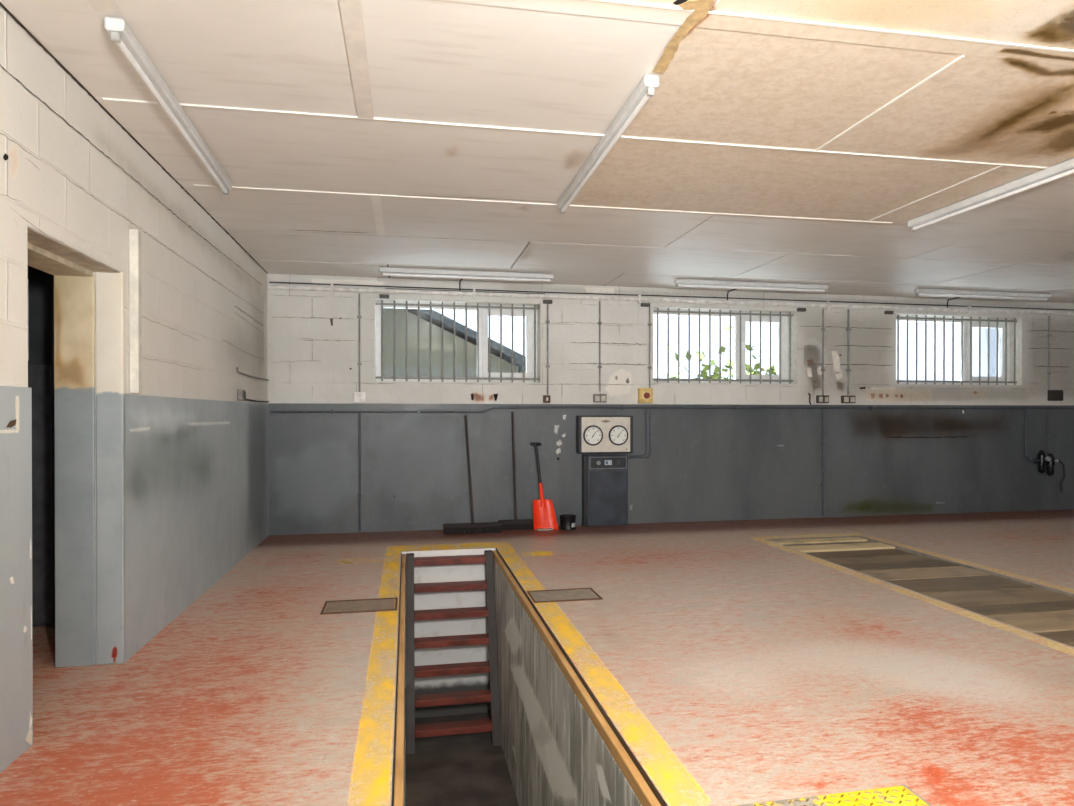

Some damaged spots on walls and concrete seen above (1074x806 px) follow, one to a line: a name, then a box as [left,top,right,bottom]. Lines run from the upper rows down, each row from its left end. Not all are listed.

peeling [680,0,699,10]
damp [783,0,1074,164]
damp [872,314,1074,441]